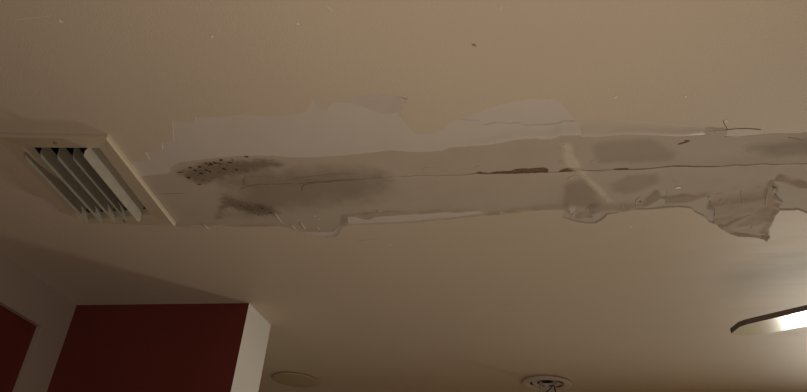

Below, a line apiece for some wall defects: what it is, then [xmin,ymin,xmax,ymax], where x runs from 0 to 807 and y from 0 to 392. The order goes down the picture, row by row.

peeling [133,101,582,176]
damp [141,130,807,232]
crack [475,160,628,176]
peeling [772,181,807,213]
peeling [348,211,486,225]